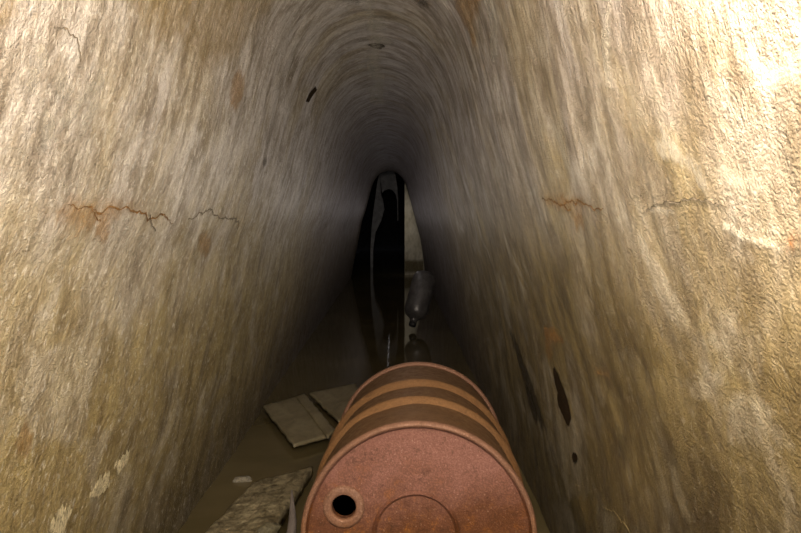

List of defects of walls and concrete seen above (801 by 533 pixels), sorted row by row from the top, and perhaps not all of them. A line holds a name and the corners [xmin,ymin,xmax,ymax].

crack [68,204,239,231]
crack [542,197,603,211]
spalling [553,367,571,427]
peeling [89,450,130,498]
peeling [49,503,72,533]